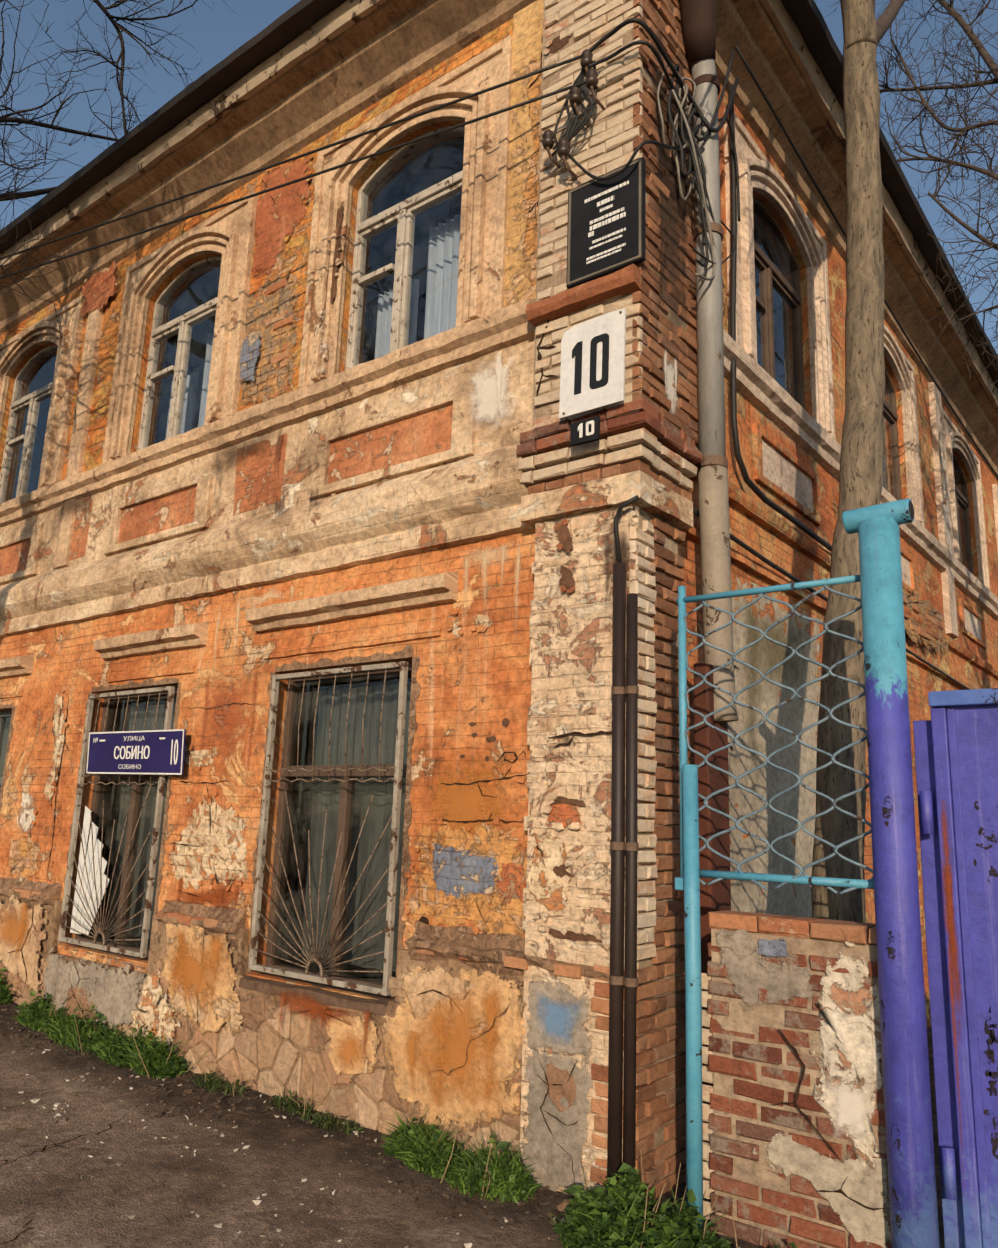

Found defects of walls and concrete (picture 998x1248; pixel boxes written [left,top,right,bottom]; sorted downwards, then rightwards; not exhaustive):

spalling [553,519,575,593]
spalling [902,580,949,657]
flaking render [8,689,68,881]
crack [430,725,612,823]
peeling [169,790,249,892]
flaking render [402,796,602,942]
crack [418,989,460,1011]
crack [429,1004,510,1075]
crack [771,1029,886,1211]